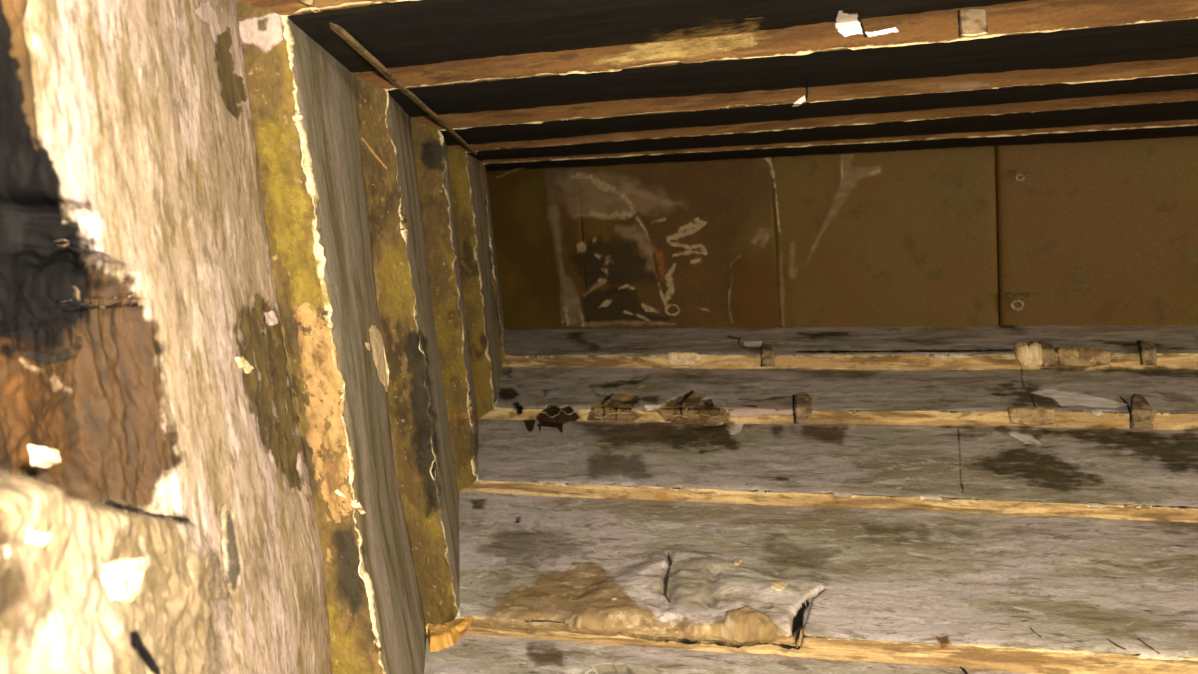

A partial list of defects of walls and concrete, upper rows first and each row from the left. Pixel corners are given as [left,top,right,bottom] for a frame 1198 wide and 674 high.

leakage [546,169,707,350]
spalling [0,209,181,513]
leakage [995,426,1198,442]
crack [105,500,190,521]
spalling [487,562,752,645]
spalling [595,665,632,674]